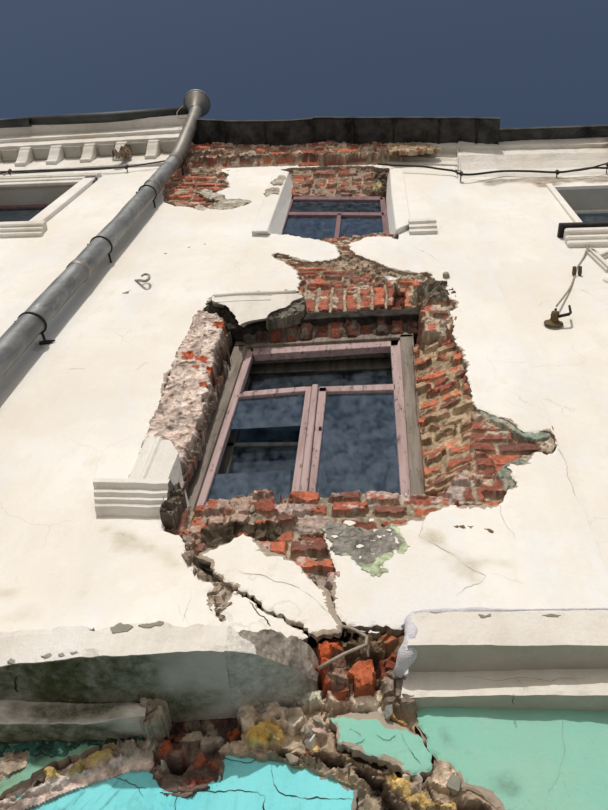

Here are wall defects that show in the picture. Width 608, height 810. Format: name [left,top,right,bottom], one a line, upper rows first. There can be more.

spalling [164,170,251,211]
peeling [263,175,286,197]
spalling [139,300,232,491]
peeling [479,410,556,491]
peeling [300,518,410,577]
crack [182,546,357,649]
leakage [0,655,156,762]
spalling [218,627,501,810]
spalling [0,734,178,810]
crack [202,756,350,810]